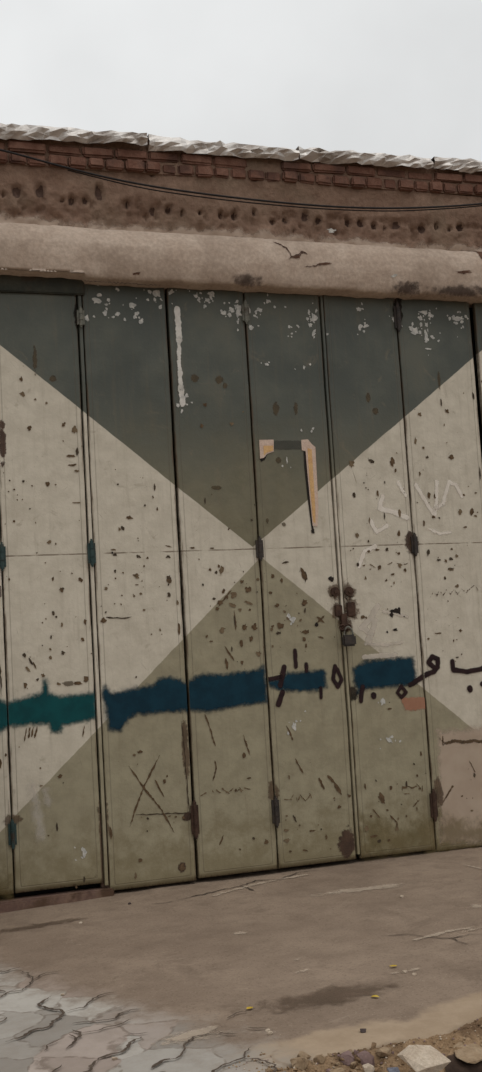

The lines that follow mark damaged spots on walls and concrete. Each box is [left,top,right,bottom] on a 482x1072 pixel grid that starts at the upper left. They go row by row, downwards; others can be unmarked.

crack [274,242,321,267]
crack [0,968,146,1072]
crack [151,1011,277,1072]